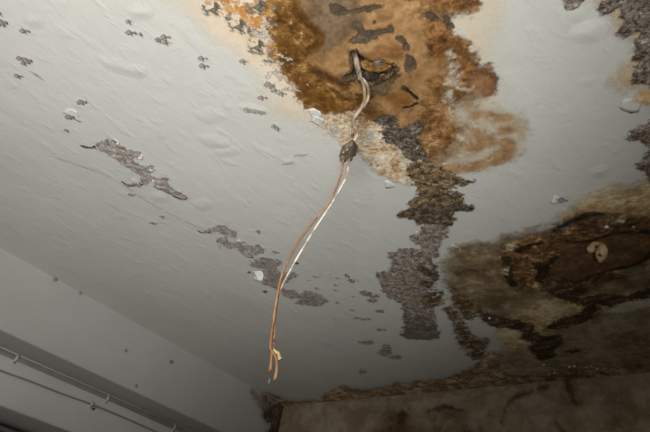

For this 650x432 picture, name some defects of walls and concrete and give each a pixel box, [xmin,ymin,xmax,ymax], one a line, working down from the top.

water stain [243,19,300,92]
rust [186,0,526,186]
spalling [597,0,650,114]
peeling [80,138,187,201]
spalling [627,122,650,185]
peeling [197,225,328,307]
spalling [352,114,475,341]
water stain [250,180,650,432]